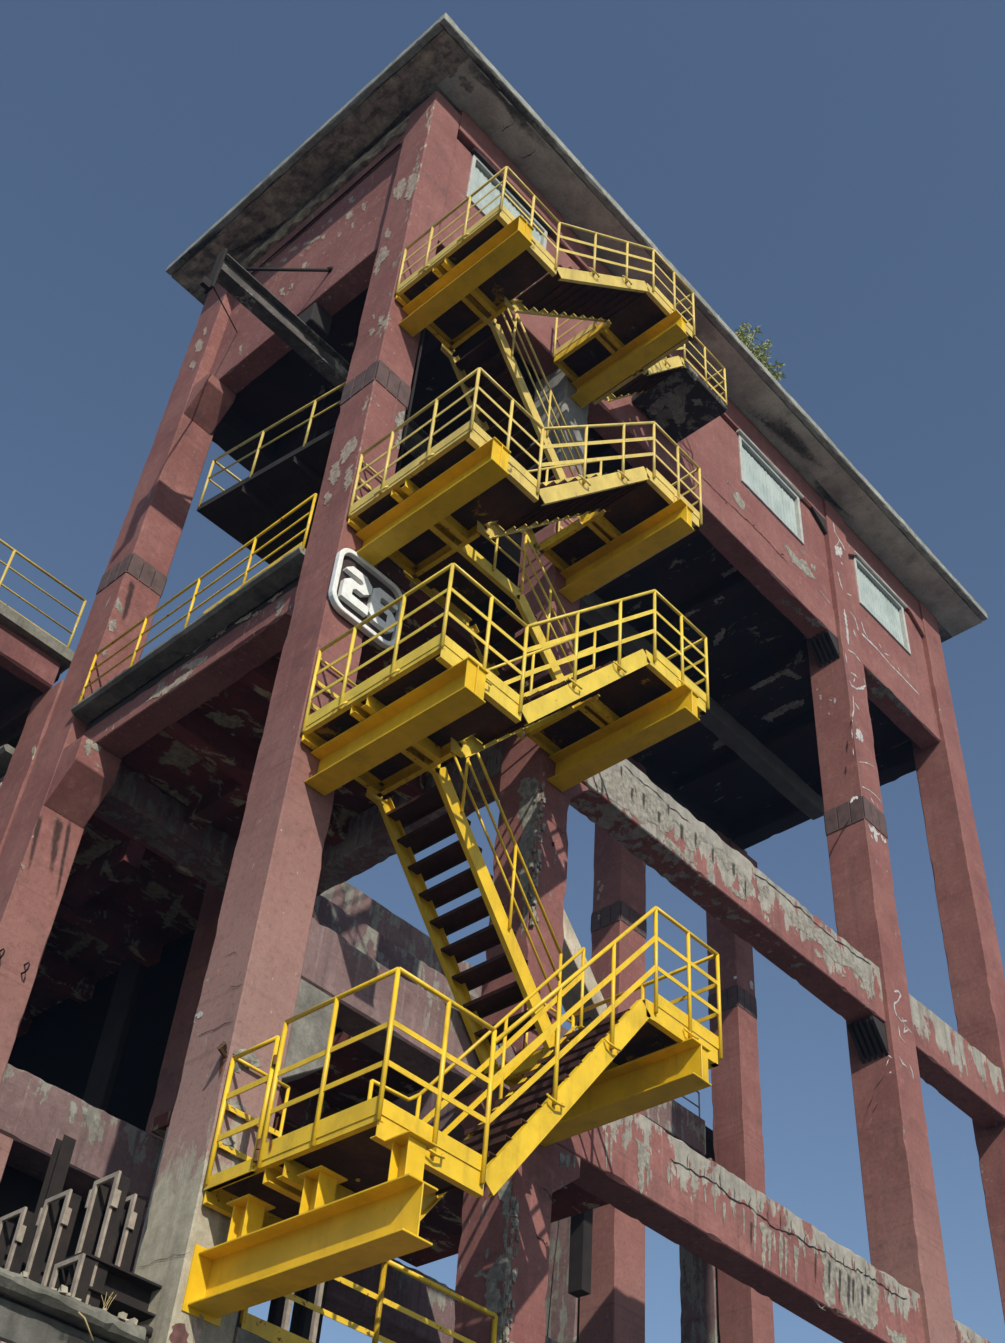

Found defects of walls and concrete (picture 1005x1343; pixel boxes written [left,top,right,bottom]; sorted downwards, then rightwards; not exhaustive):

peeling [393,165,419,201]
peeling [262,195,366,268]
peeling [373,228,391,275]
peeling [189,327,207,369]
spalling [646,391,703,428]
peeling [595,769,769,902]
peeling [635,1138,650,1193]
spalling [469,1180,520,1343]
crack [670,1156,907,1300]
peeling [704,1187,907,1343]